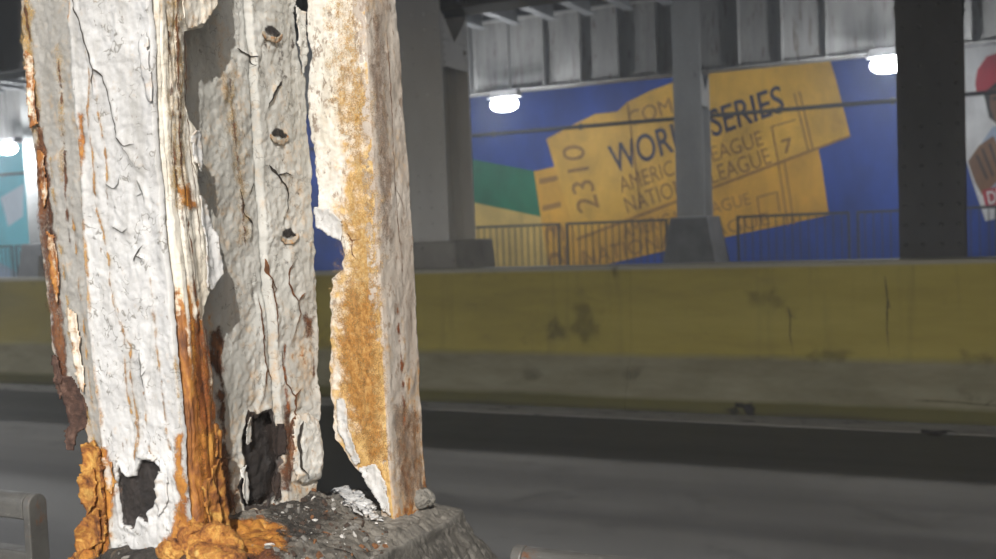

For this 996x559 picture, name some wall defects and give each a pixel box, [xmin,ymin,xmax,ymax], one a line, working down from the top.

peeling [23,50,38,128]
peeling [46,231,85,392]
rust [68,438,114,559]
crack [72,0,144,200]
peeling [136,452,169,516]
rust [162,428,190,542]
crack [175,3,203,280]
rust [189,312,238,513]
peeling [240,465,250,504]
crack [240,164,294,237]
crack [259,259,305,424]
rust [326,2,425,507]